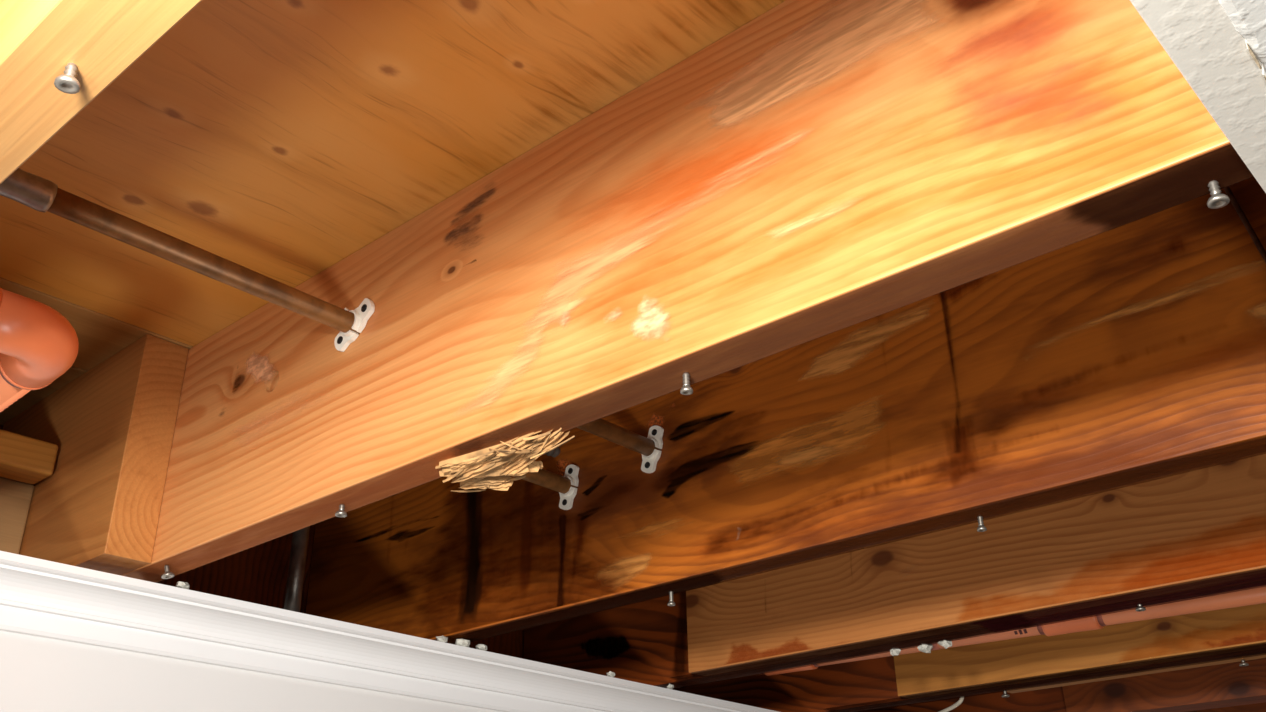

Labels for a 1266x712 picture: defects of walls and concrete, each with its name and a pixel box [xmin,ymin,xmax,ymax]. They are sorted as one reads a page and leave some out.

water stain [952,0,994,8]
water stain [446,189,494,240]
water stain [454,144,1254,456]
peeling [443,428,575,492]
crack [662,411,757,498]
water stain [425,438,1266,688]